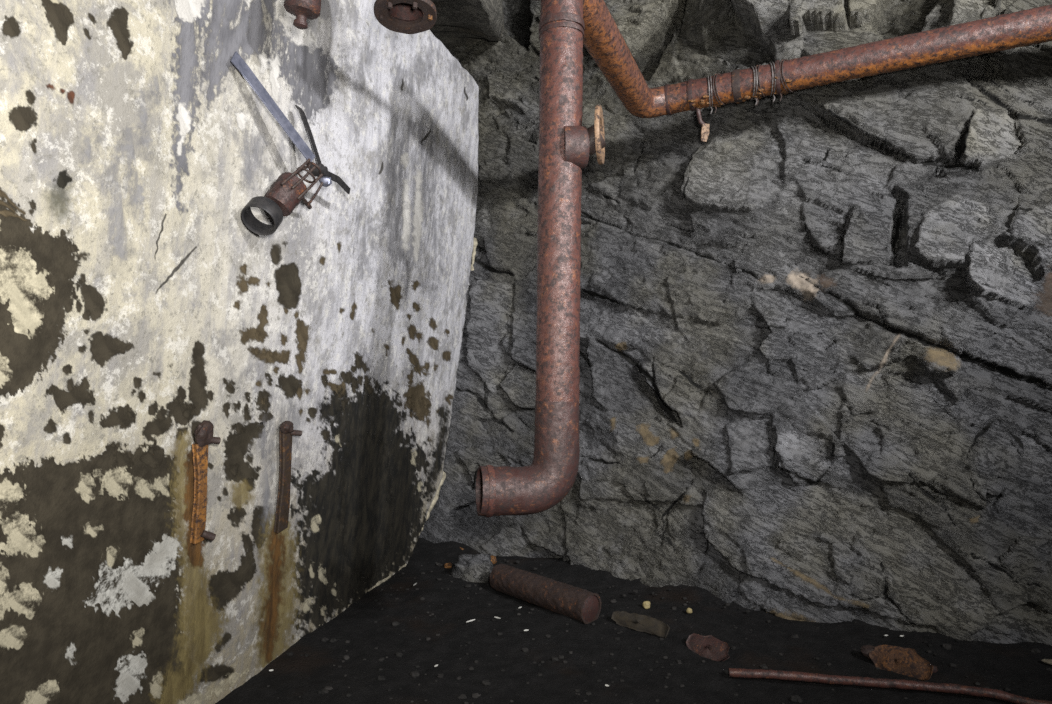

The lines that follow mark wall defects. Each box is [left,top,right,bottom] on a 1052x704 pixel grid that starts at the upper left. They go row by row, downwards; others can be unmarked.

spalling [2,16,21,38]
spalling [42,0,134,60]
spalling [9,90,37,153]
crack [802,74,1052,172]
crack [581,194,765,280]
spalling [388,261,451,421]
crack [580,340,704,422]
crack [806,278,1052,387]
peeling [0,187,310,704]
leakage [290,352,453,639]
corrosion [151,435,228,704]
corrosion [233,469,298,667]